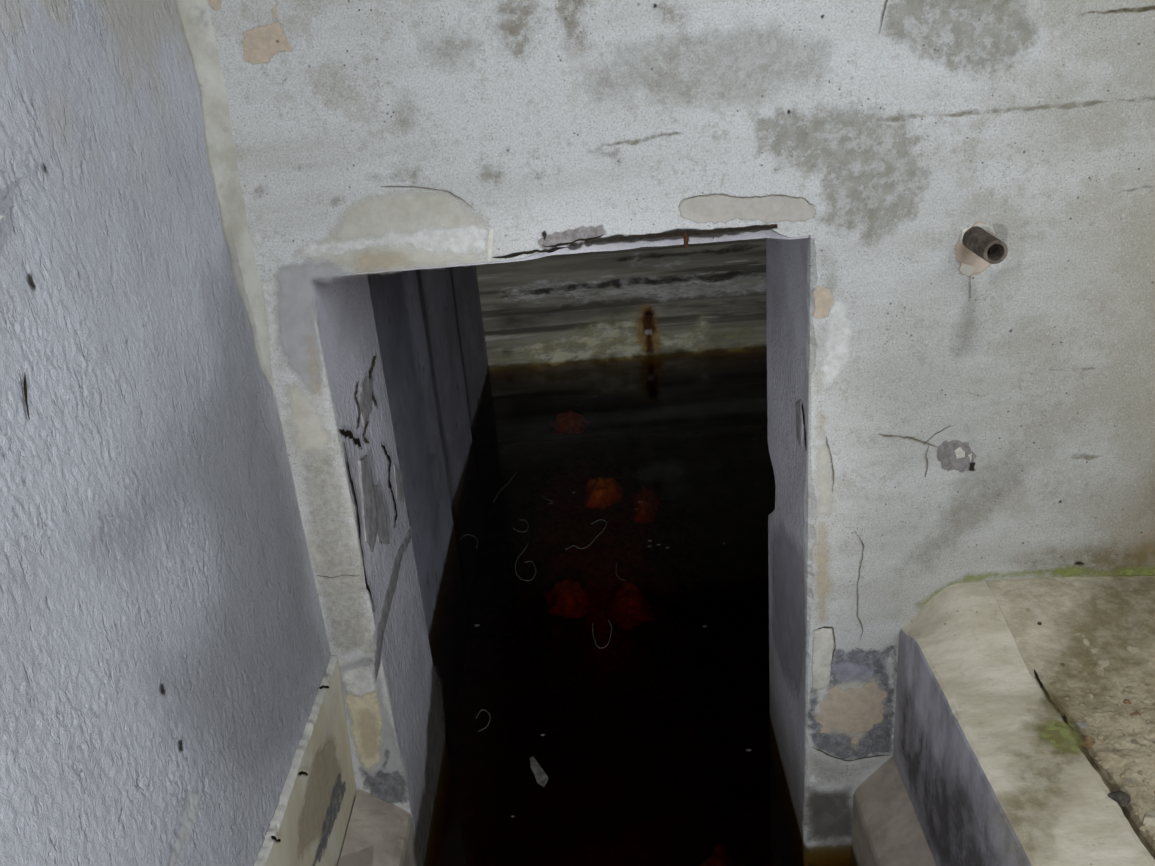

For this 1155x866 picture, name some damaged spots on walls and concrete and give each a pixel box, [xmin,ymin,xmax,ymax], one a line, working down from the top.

crack [1089,5,1155,13]
crack [950,101,1099,116]
spalling [955,221,996,277]
rust [639,308,657,353]
spalling [814,286,852,386]
peeling [807,627,897,761]